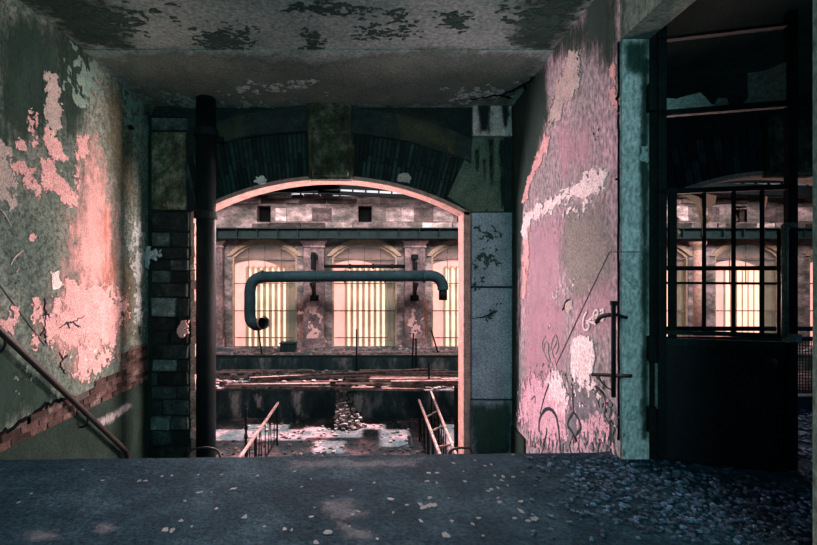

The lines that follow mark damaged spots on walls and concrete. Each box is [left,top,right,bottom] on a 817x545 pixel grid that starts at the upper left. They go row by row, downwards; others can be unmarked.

crack [470,76,535,100]
peeling [609,61,621,114]
peeling [520,49,609,301]
peeling [0,40,163,452]
water stain [0,0,650,454]
crack [40,298,85,374]
spalling [297,301,327,342]
spalling [407,301,424,338]
peeling [516,333,642,525]